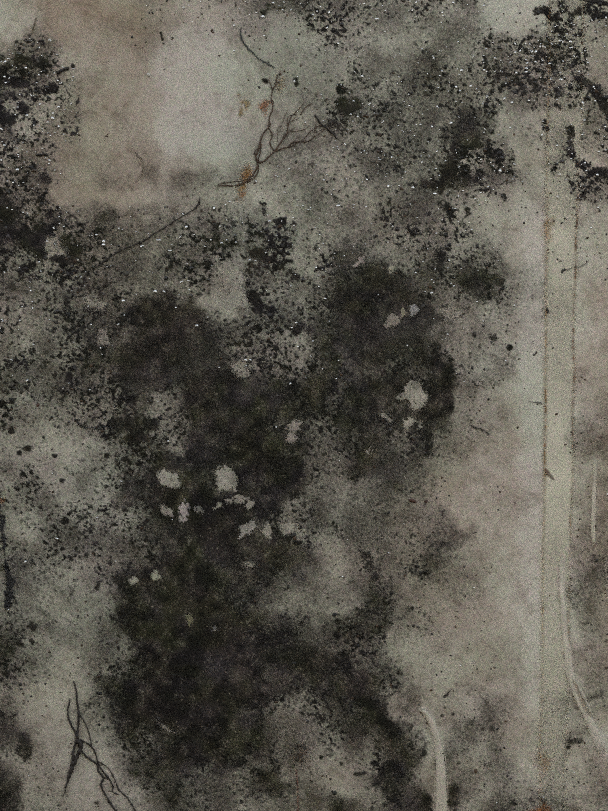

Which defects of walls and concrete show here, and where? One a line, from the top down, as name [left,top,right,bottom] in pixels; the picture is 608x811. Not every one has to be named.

crack [240,27,275,68]
damp [521,119,608,225]
crack [0,508,16,610]
damp [442,689,581,811]